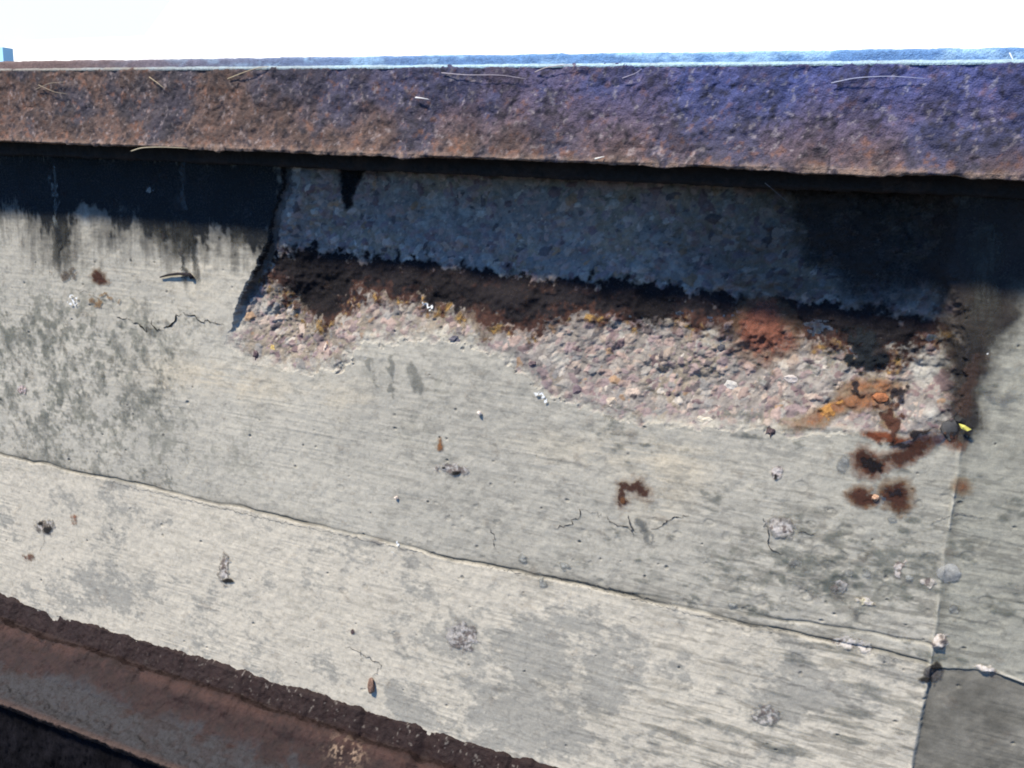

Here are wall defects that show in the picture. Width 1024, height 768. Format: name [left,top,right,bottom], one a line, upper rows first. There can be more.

water stain [0,155,287,281]
crack [76,289,221,332]
spalling [224,167,965,446]
rust [254,240,964,513]
rust [954,479,968,492]